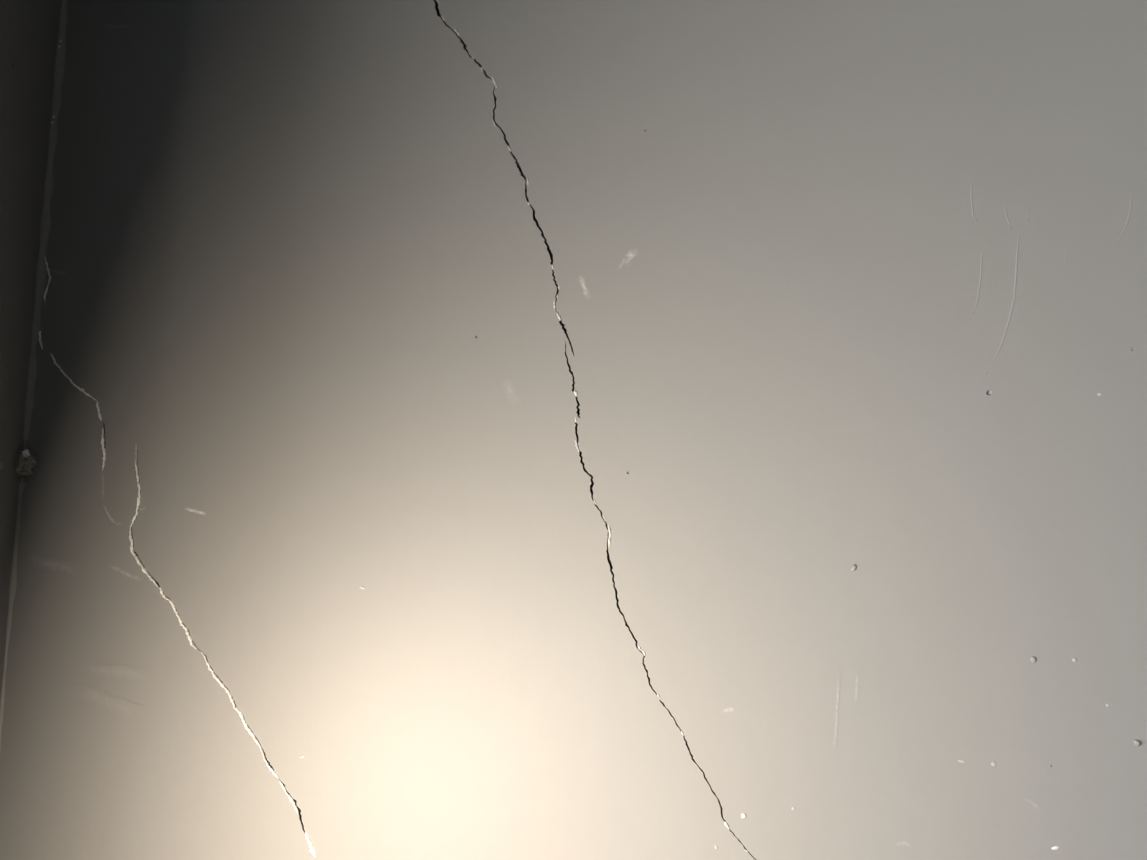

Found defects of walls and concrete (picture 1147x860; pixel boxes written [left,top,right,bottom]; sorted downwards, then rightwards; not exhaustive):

crack [38,331,316,858]
crack [433,0,756,860]